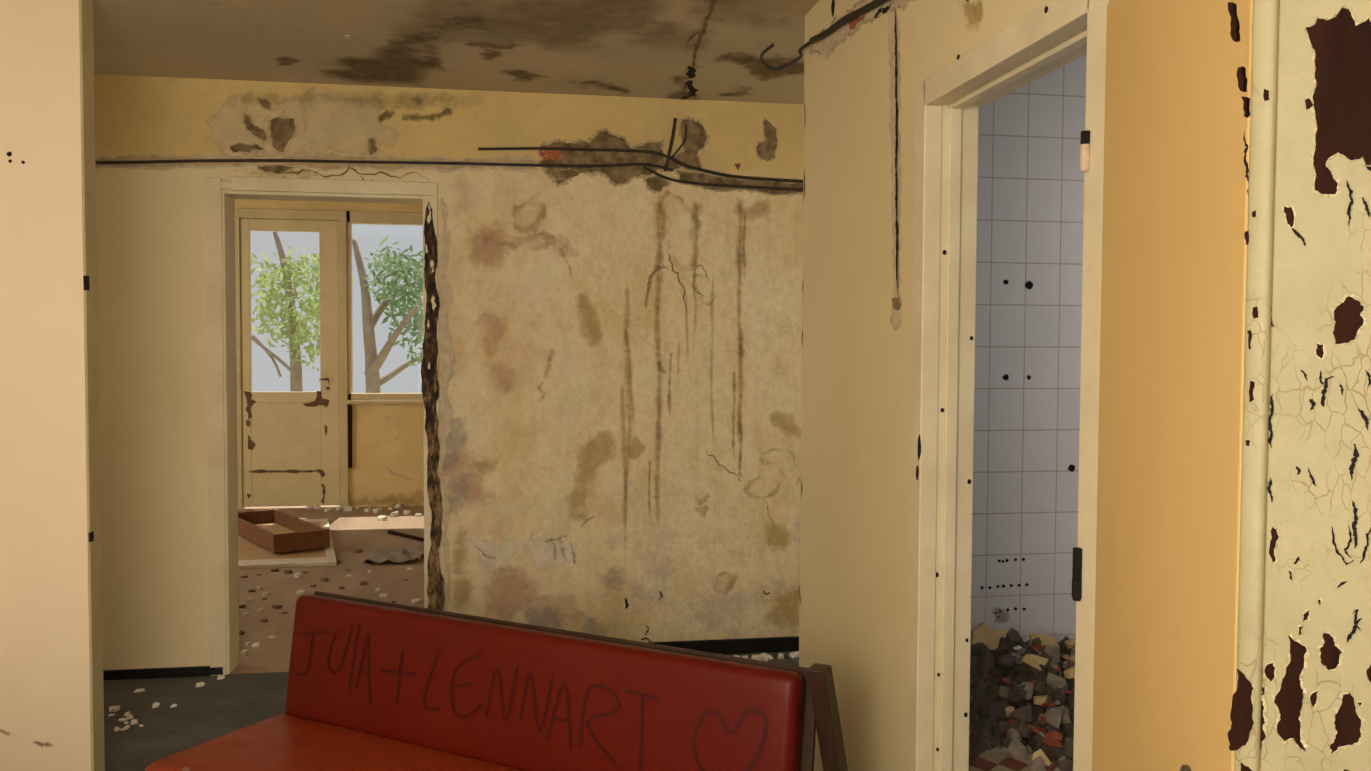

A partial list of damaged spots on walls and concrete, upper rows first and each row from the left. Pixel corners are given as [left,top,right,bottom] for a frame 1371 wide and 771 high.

water stain [329,36,435,82]
water stain [722,55,804,80]
water stain [379,99,451,121]
peeling [95,63,805,200]
peeling [1304,5,1371,198]
crack [1346,166,1371,225]
crack [1292,228,1306,246]
peeling [1314,294,1368,361]
spalling [421,198,454,611]
crack [1271,535,1299,580]
peeling [1228,598,1345,771]
peeling [1327,691,1366,771]